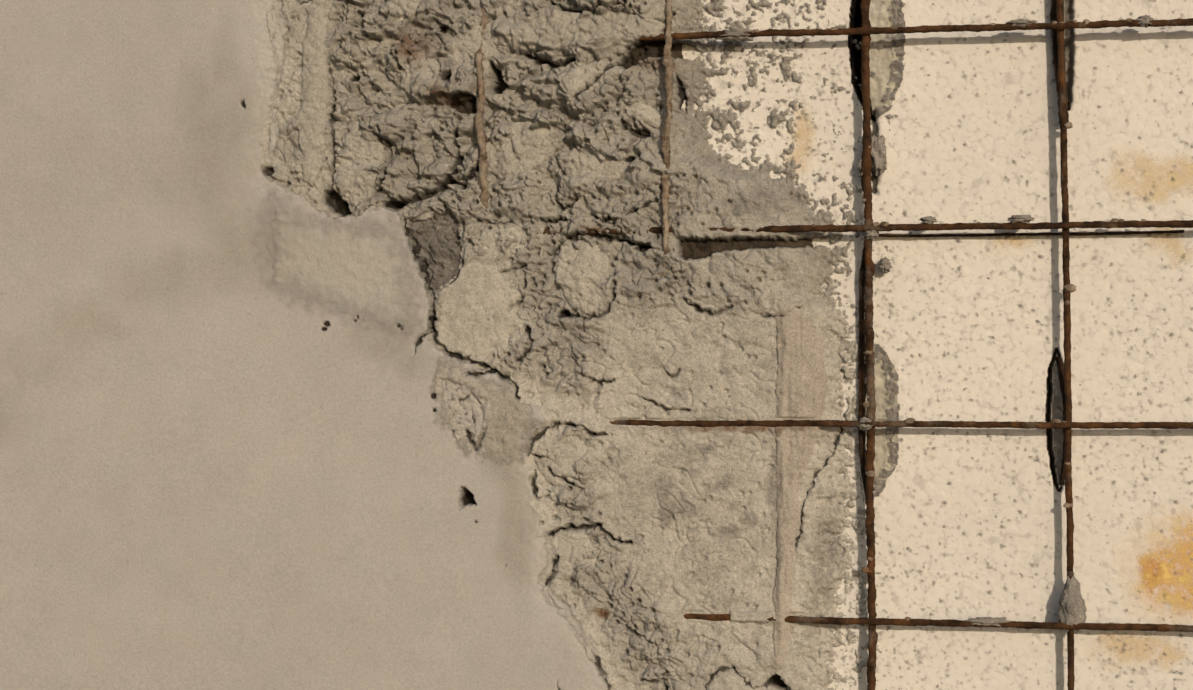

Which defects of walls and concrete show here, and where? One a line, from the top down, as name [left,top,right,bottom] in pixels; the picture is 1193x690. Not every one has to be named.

hole [450,93,477,114]
hole [493,64,509,94]
hole [619,40,683,69]
peeling [267,191,466,332]
crack [380,132,655,451]
hole [680,238,822,260]
peeling [431,359,542,465]
crack [529,423,607,496]
spalling [462,489,476,505]
crack [545,523,632,585]
corrosion [1140,525,1193,610]
spalling [767,674,787,688]